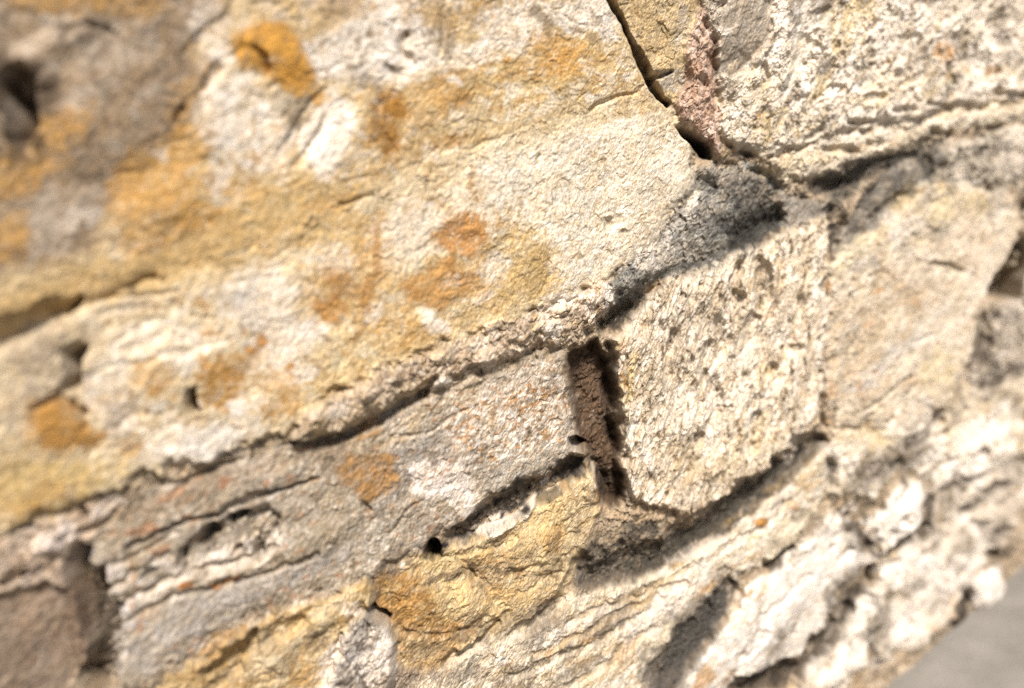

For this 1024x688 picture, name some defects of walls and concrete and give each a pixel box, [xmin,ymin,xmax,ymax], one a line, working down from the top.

crack [587,0,674,112]